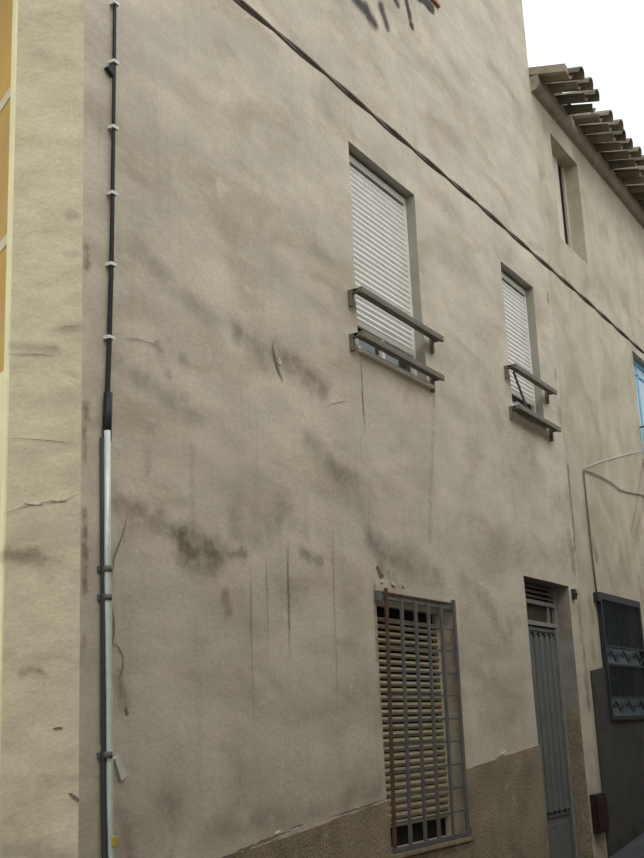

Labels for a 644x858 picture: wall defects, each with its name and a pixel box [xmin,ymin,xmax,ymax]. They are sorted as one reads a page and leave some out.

crack [3,494,78,515]
crack [112,606,124,699]